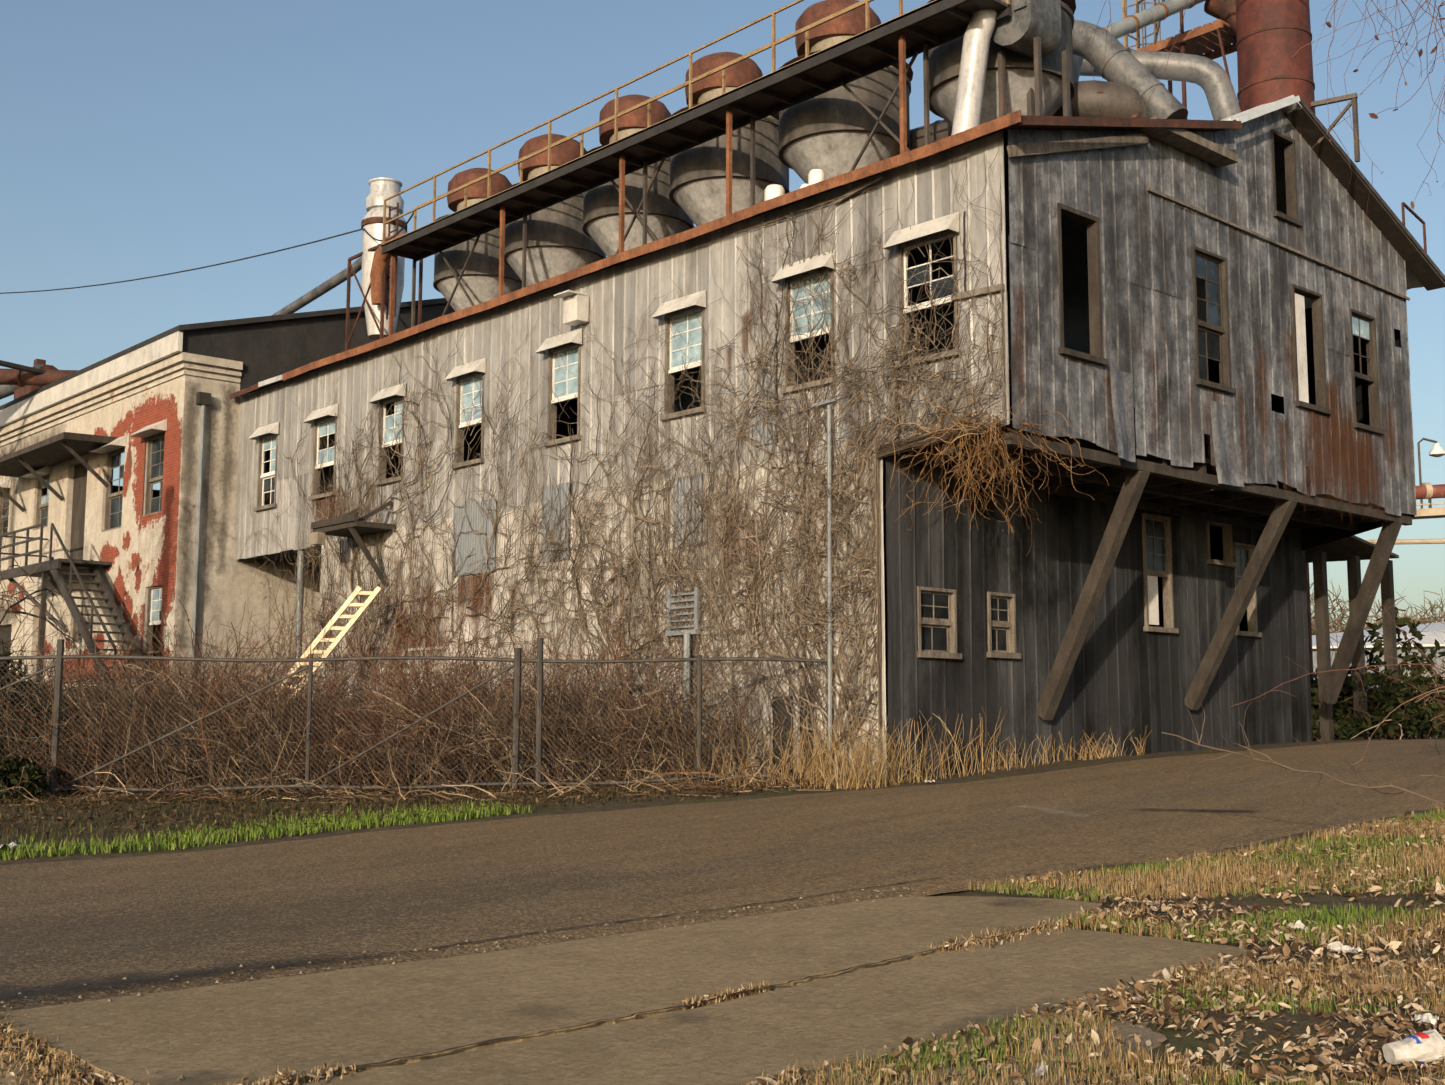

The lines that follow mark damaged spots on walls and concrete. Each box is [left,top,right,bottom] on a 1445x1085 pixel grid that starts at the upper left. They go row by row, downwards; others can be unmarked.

peeling [45,392,182,686]